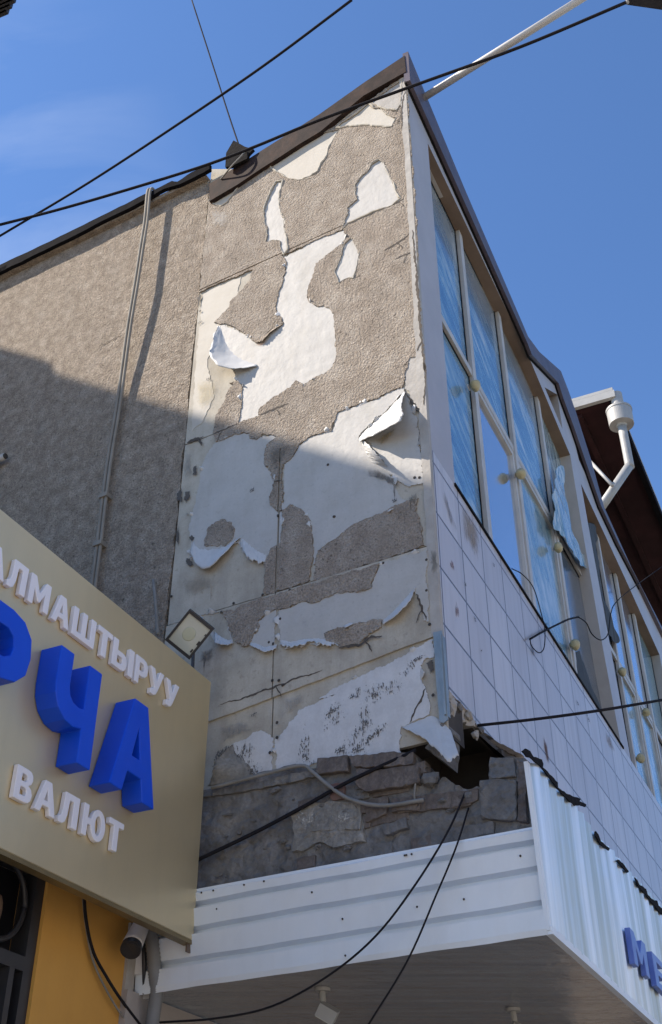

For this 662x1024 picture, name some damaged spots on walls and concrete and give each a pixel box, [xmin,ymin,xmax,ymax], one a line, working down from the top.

peeling [176,79,423,569]
peeling [200,608,233,646]
peeling [250,549,430,652]
crack [220,670,322,705]
peeling [208,639,505,789]
crack [410,689,425,722]